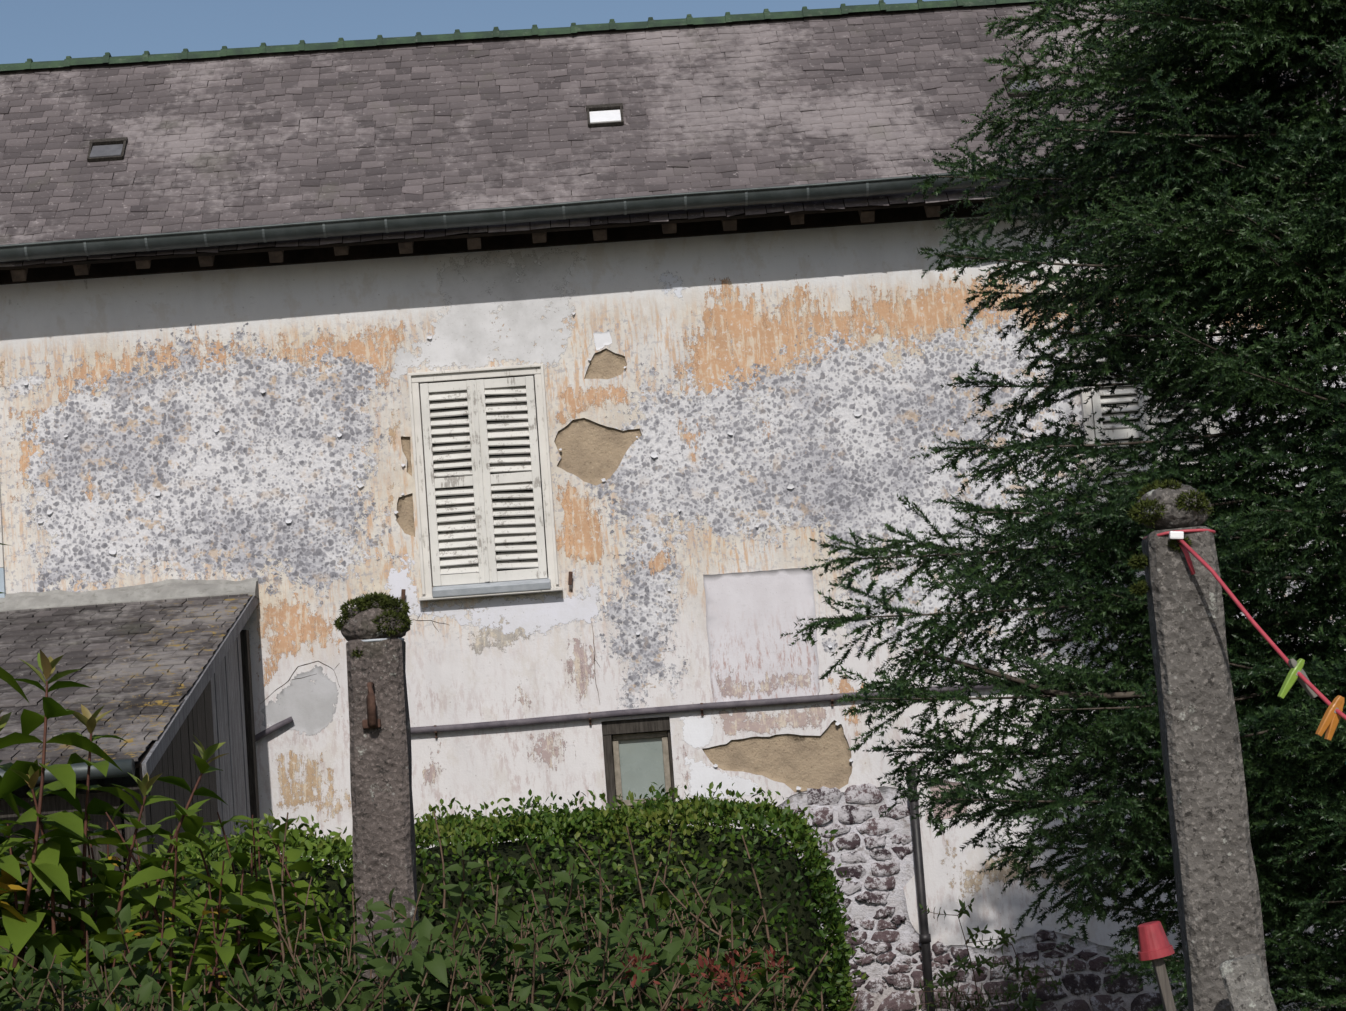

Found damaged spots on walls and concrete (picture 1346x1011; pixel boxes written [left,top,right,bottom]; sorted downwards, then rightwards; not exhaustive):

peeling [0,322,415,611]
damp [4,321,416,501]
damp [678,418,706,465]
peeling [554,303,1149,709]
peeling [1219,404,1341,494]
damp [642,550,671,579]
peeling [1237,568,1311,619]
spalling [702,704,853,793]